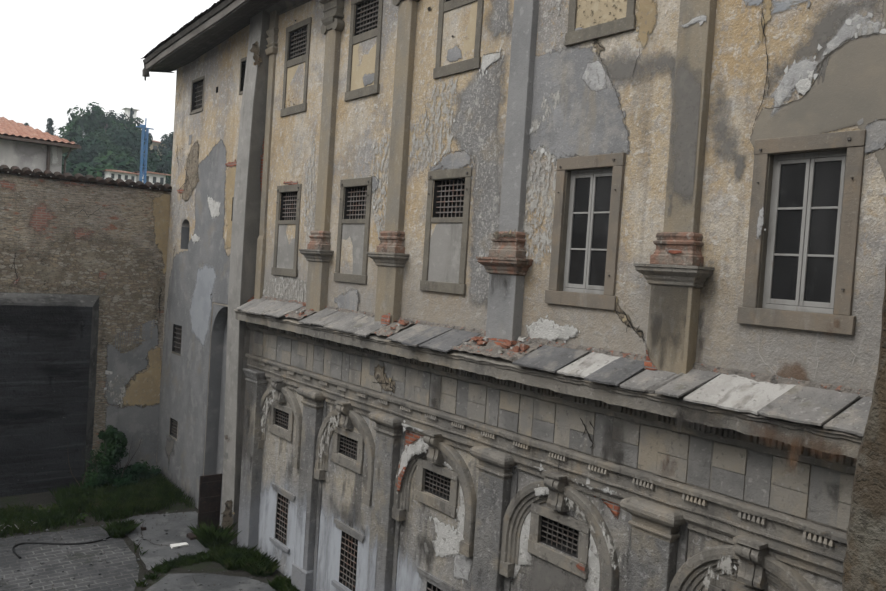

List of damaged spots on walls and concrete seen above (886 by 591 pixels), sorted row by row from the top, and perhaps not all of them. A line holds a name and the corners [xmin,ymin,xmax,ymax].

peeling [582,39,628,133]
crack [753,0,769,126]
peeling [750,11,886,138]
damp [714,97,744,180]
peeling [151,134,222,275]
peeling [207,159,237,249]
peeling [100,320,162,408]
peeling [526,315,580,348]
crack [616,311,645,342]
peeling [396,420,429,491]
crack [580,418,594,448]
peeling [424,486,473,584]